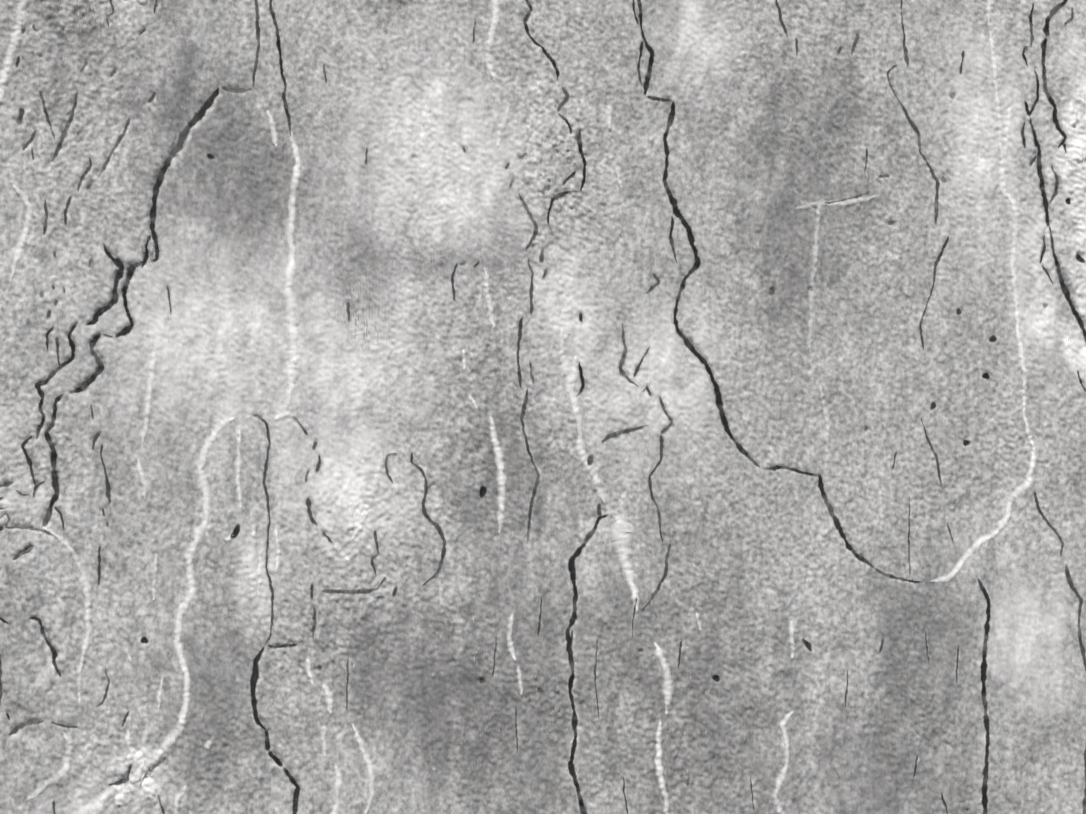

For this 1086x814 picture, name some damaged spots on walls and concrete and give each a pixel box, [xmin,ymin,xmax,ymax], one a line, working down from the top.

crack [0,0,291,585]
crack [505,0,586,529]
crack [633,0,922,582]
crack [887,0,949,350]
crack [1021,0,1086,340]
crack [0,617,61,676]
crack [250,414,397,814]
crack [385,452,446,585]
crack [537,504,607,814]
crack [587,331,673,651]
crack [955,579,991,814]
crack [1034,492,1086,667]